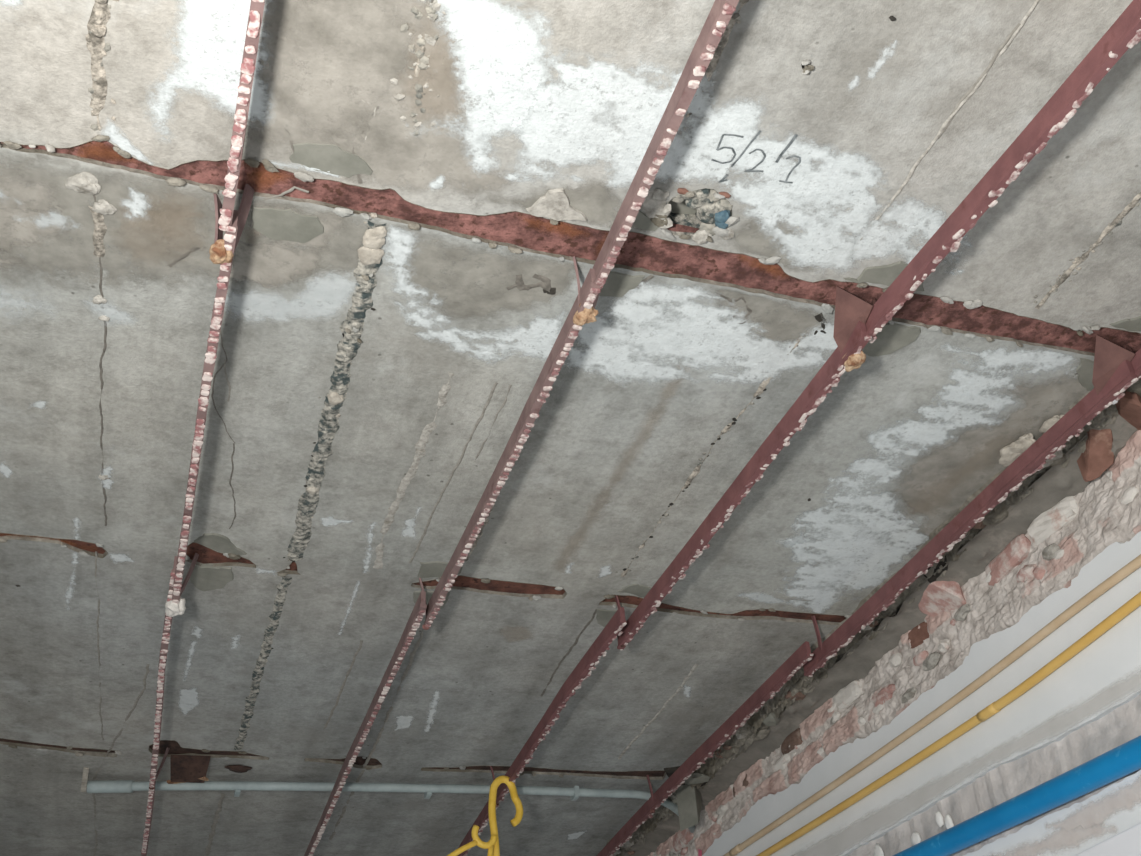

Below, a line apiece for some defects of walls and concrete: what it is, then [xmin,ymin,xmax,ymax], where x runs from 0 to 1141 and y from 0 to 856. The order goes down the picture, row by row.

crack [65,171,117,526]
crack [168,247,201,267]
crack [211,310,236,529]
spalling [0,135,608,281]
damp [149,0,682,227]
damp [568,282,838,383]
spalling [634,188,888,292]
damp [655,77,945,270]
damp [746,345,1089,613]
spalling [913,293,1141,336]
crack [95,551,104,740]
flaking render [606,391,1141,856]